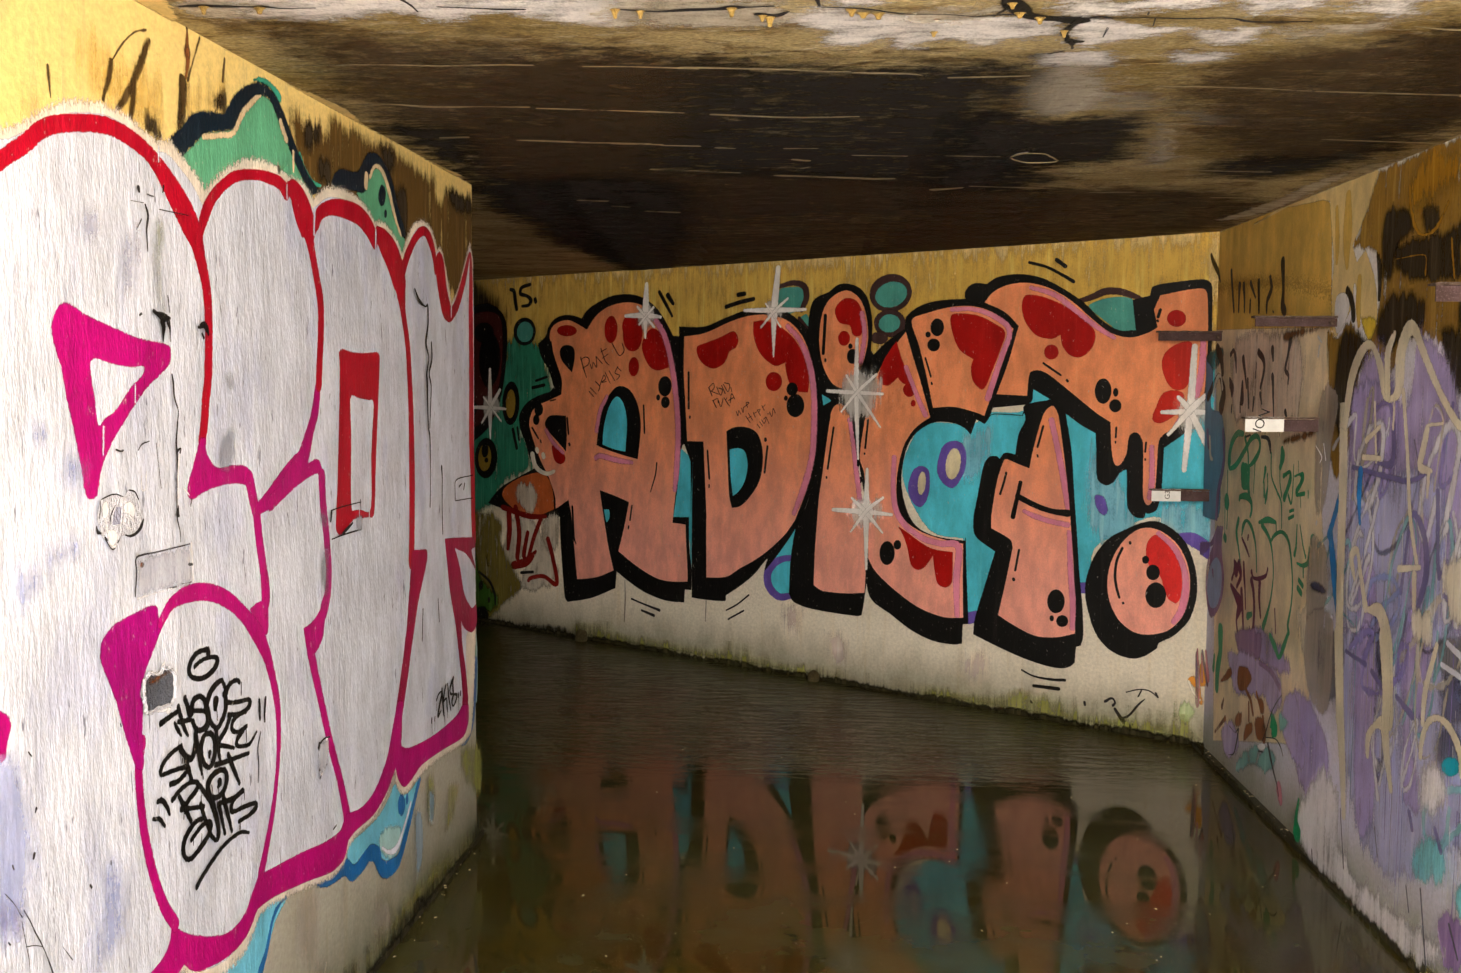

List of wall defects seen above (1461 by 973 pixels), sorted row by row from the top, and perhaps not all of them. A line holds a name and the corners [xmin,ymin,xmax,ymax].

crack [177,4,307,15]
crack [400,0,526,12]
crack [610,0,1313,54]
leakage [180,0,1417,116]
leakage [145,112,161,141]